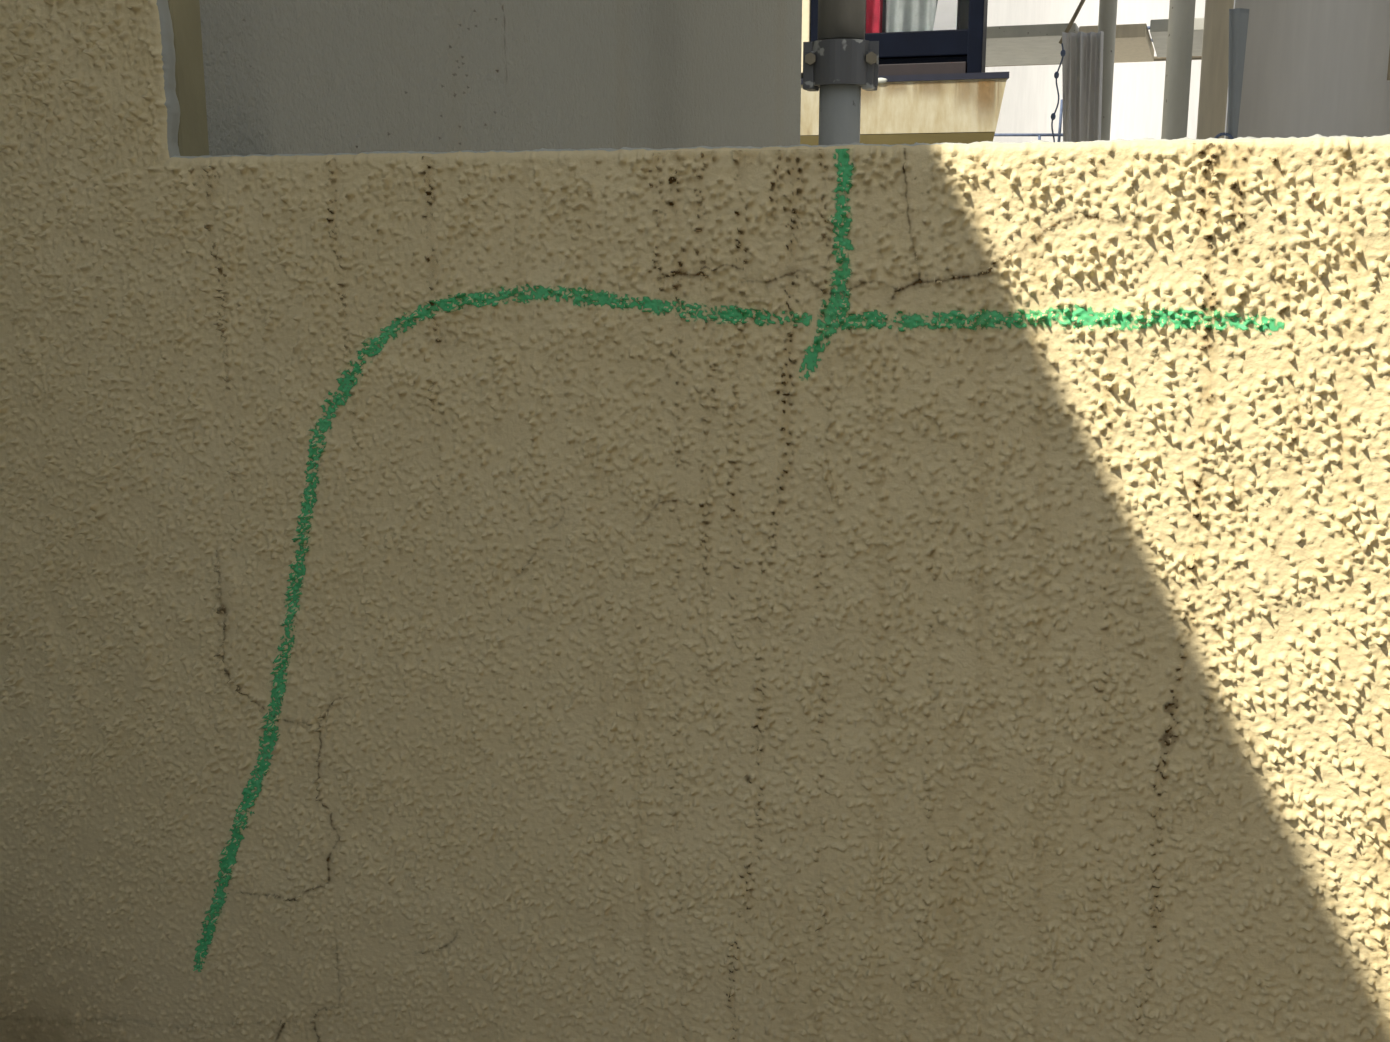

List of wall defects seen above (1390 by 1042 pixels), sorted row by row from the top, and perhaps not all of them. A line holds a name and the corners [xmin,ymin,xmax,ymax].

crack [665,265,737,277]
water stain [769,157,802,248]
crack [856,215,1099,299]
water stain [1197,143,1251,349]
crack [217,608,286,721]
water stain [1153,645,1183,796]